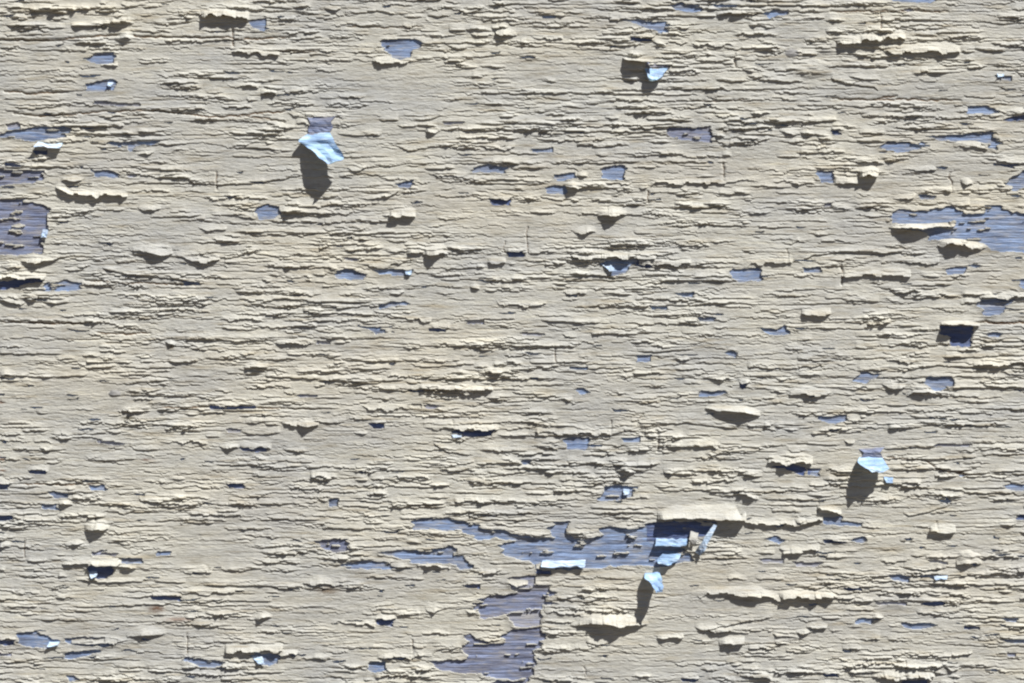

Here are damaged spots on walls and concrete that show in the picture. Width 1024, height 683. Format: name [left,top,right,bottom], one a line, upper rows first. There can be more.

peeling [372,39,422,64]
peeling [624,58,669,81]
peeling [288,111,366,171]
peeling [667,126,726,143]
peeling [0,122,137,305]
peeling [842,177,1024,277]
peeling [552,247,691,276]
peeling [940,279,1024,348]
peeling [844,438,893,483]
peeling [62,519,245,602]
peeling [314,489,867,683]
peeling [0,625,168,659]